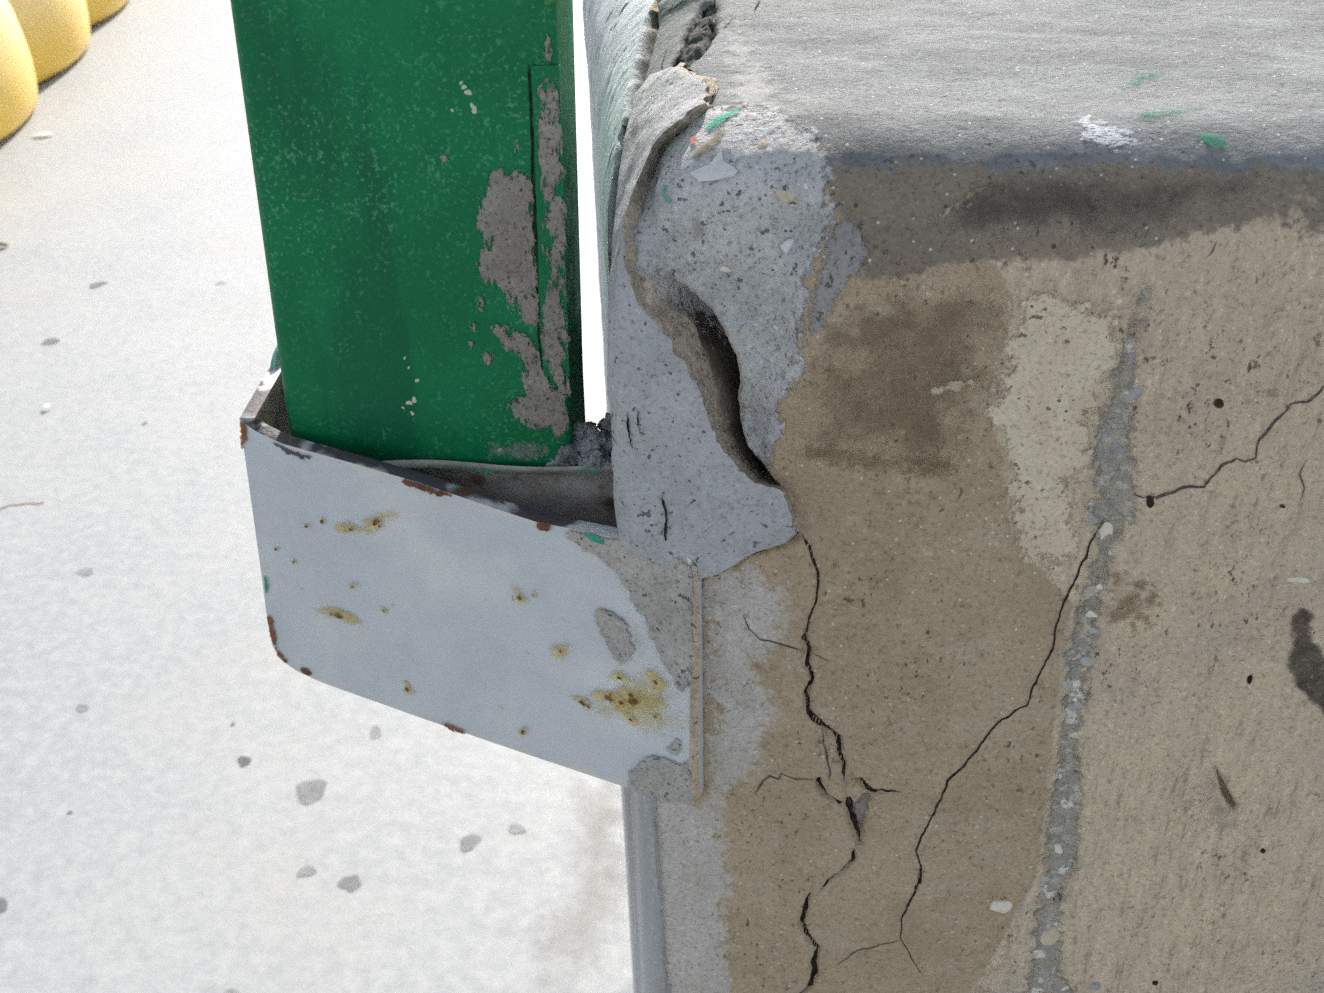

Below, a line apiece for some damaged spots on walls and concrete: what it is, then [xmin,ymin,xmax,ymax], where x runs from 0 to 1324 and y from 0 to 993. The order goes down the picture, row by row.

peeling [543,34,552,61]
peeling [468,78,571,438]
crack [1133,385,1324,500]
rust [303,514,394,533]
rust [323,609,359,624]
rust [573,672,665,725]
damp [1288,609,1324,712]
crack [732,520,1103,993]